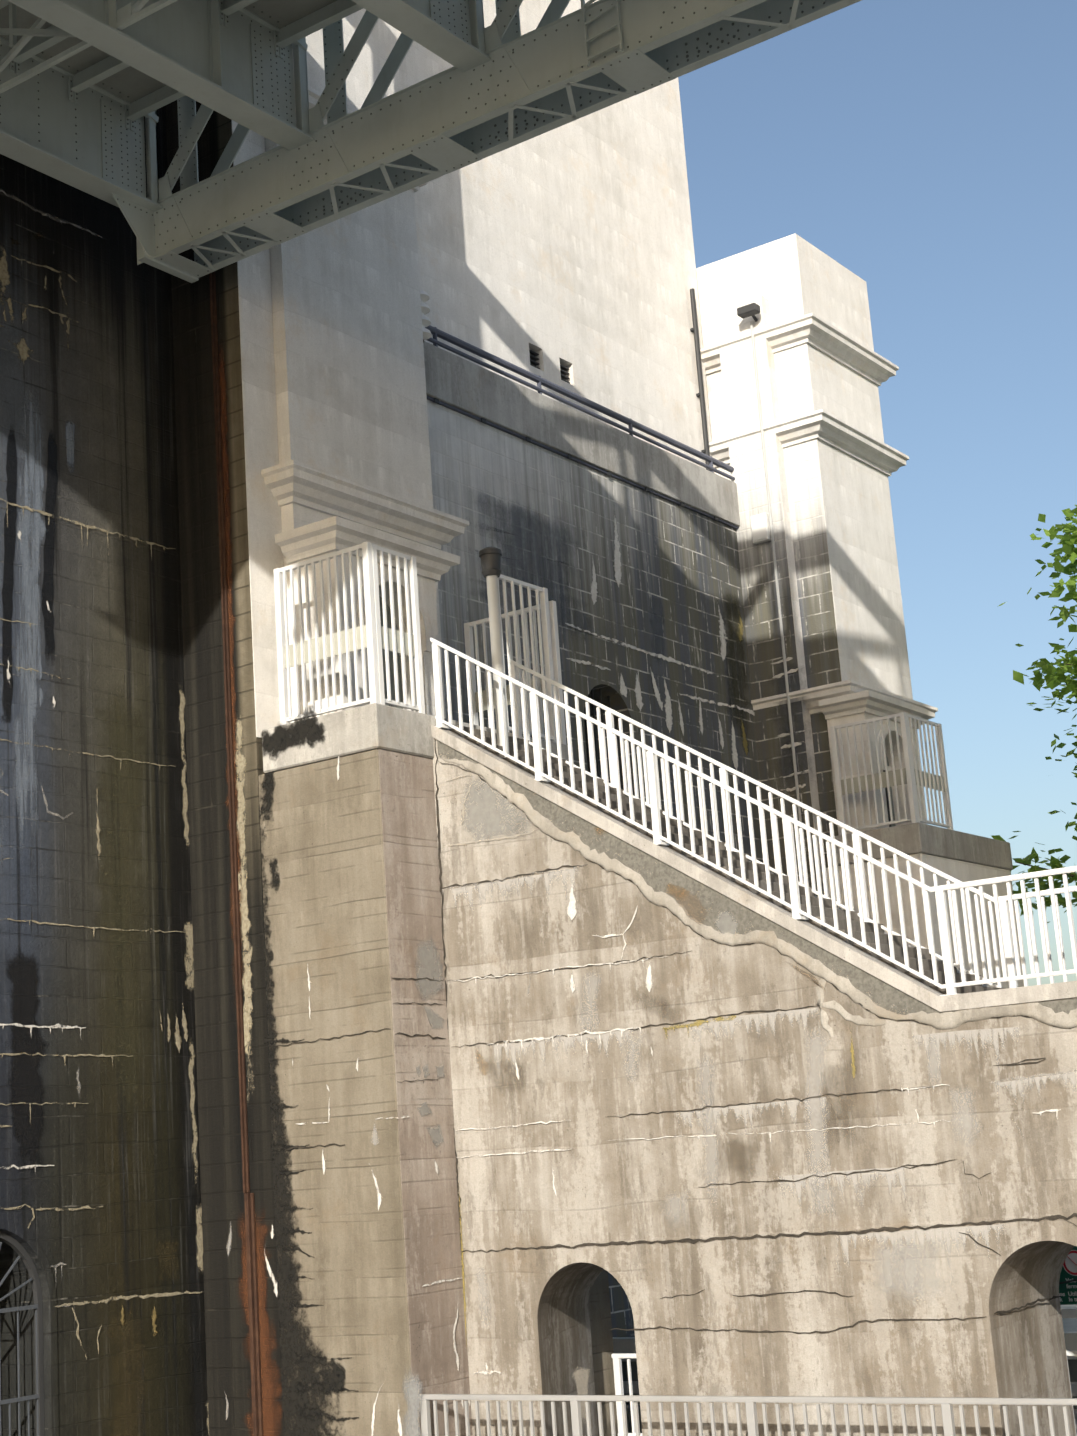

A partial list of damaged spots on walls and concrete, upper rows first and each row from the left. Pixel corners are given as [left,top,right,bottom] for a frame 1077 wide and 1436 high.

leakage [0,392,190,860]
leakage [499,506,755,770]
leakage [0,918,198,1178]
leakage [234,706,381,1436]
crack [275,738,820,1083]
leakage [453,956,667,1080]
crack [607,1087,930,1118]
leakage [608,1008,1077,1209]
leakage [55,1291,202,1335]
rust [239,1221,282,1436]
crack [454,1138,1077,1297]
crack [611,1289,1061,1334]